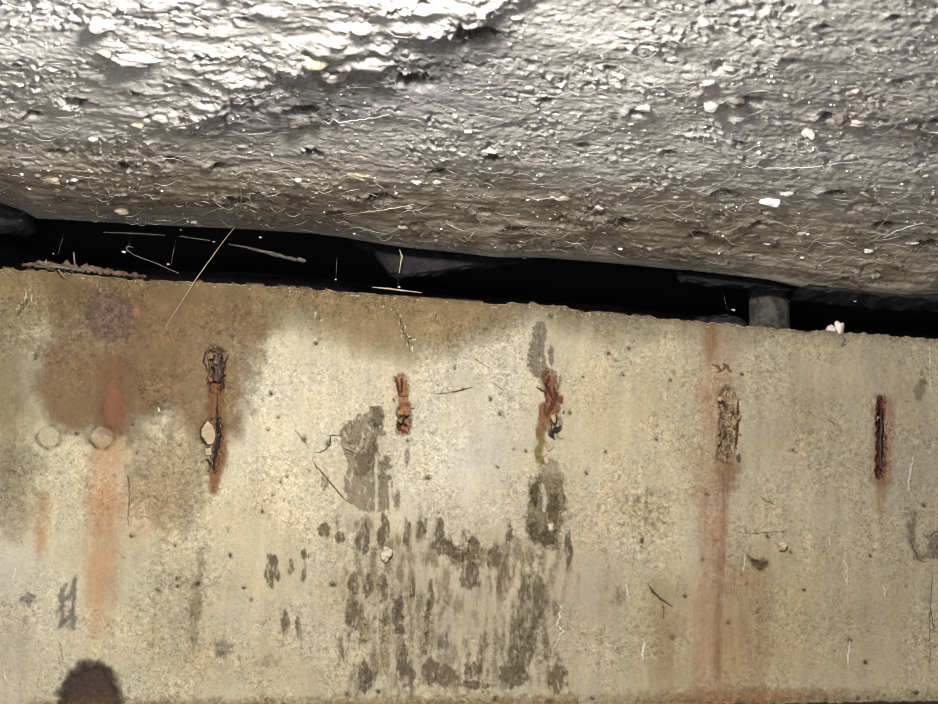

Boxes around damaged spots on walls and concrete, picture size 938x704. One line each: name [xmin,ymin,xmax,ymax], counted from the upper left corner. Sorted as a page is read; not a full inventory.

damp [548,307,652,328]
damp [527,321,554,381]
damp [0,268,534,520]
spalling [715,387,742,481]
corrosion [872,396,891,489]
damp [264,549,309,588]
damp [317,406,579,699]
damp [281,610,299,634]
damp [58,661,121,704]